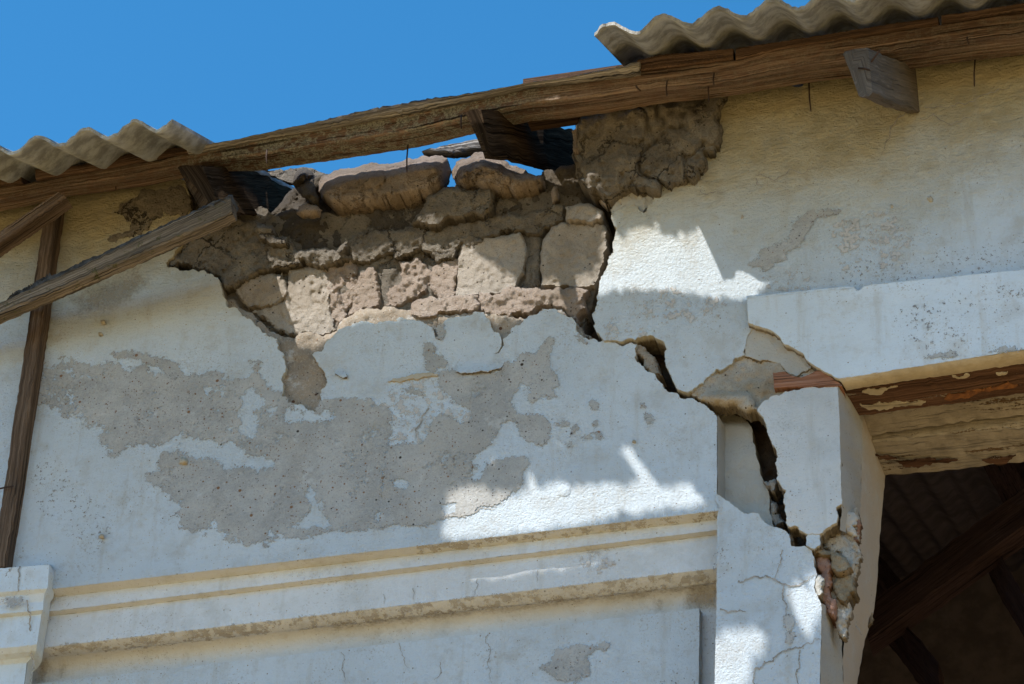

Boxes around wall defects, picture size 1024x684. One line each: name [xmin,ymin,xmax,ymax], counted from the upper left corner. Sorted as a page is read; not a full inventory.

peeling [748,208,1024,360]
peeling [38,164,728,548]
crack [636,345,677,393]
spalling [691,329,846,423]
crack [734,414,816,616]
spalling [806,508,863,643]
peeling [539,640,610,684]
crack [752,638,819,684]